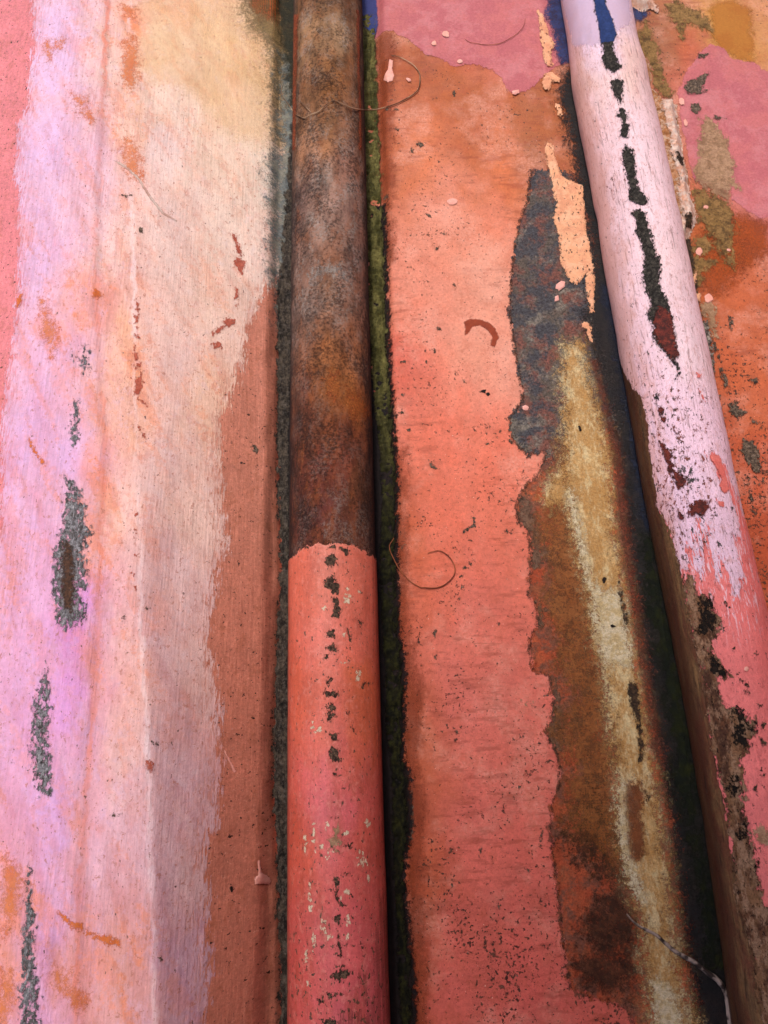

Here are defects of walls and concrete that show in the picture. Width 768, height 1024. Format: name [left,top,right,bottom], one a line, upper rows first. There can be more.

peeling [536,9,560,91]
peeling [593,0,681,380]
peeling [631,0,742,388]
peeling [27,658,54,798]
peeling [49,475,95,632]
peeling [323,676,356,776]
peeling [322,545,364,660]
water stain [362,0,728,1024]
peeling [506,143,703,1024]
corrosion [541,336,705,1024]